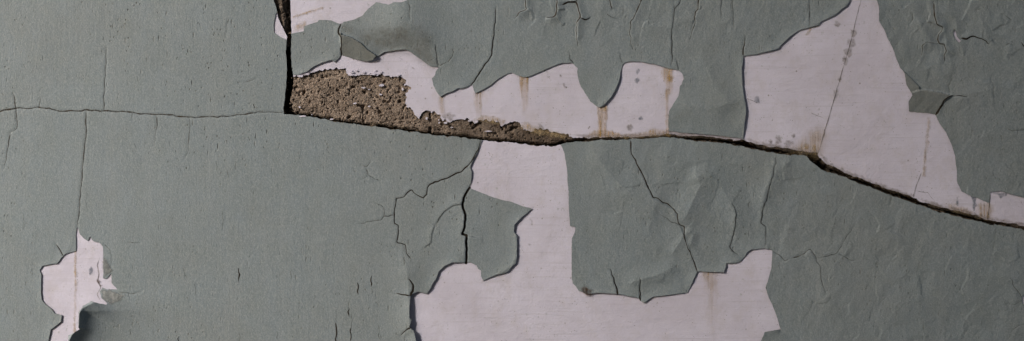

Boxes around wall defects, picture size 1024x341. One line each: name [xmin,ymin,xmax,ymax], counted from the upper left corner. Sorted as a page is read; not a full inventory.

crack [470,0,642,86]
crack [671,0,722,66]
crack [912,4,1024,61]
crack [0,32,1024,296]
peeling [274,0,1024,341]
peeling [40,227,117,341]
crack [610,269,641,301]